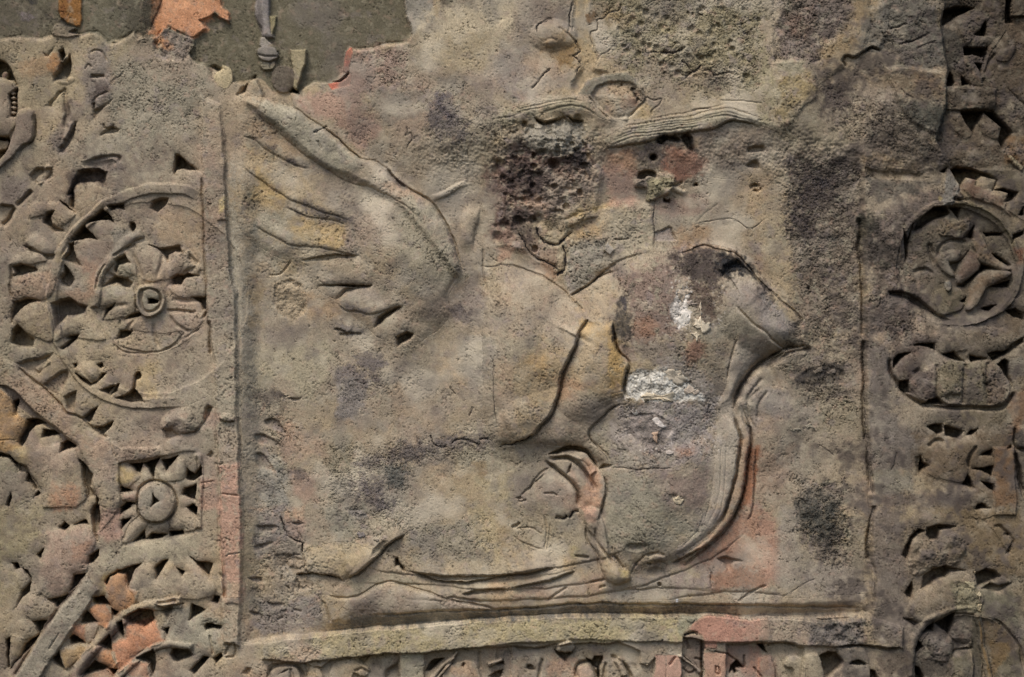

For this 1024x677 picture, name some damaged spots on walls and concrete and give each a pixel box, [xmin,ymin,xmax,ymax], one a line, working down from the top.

spalling [527,120,585,157]
leakage [688,283,722,321]